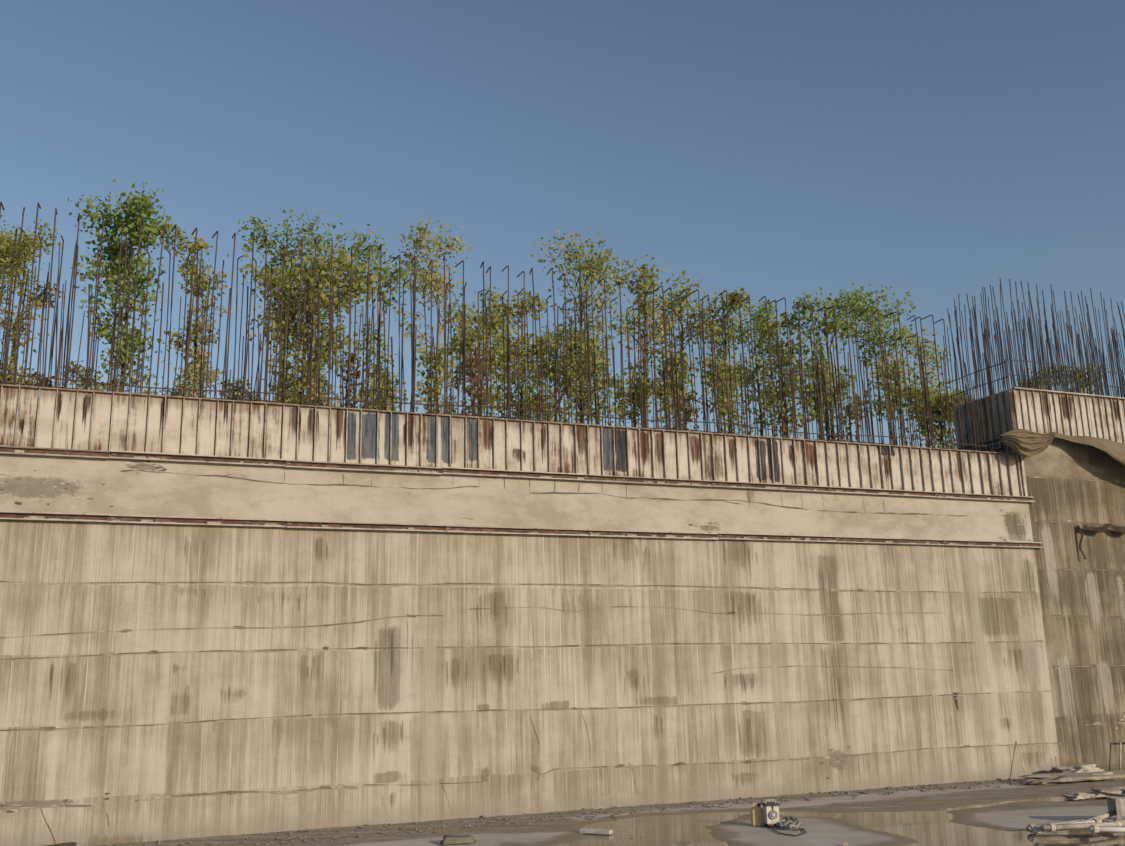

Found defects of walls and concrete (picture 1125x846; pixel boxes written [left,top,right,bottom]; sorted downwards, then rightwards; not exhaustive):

corrosion [82,395,91,424]
corrosion [159,397,168,433]
corrosion [289,407,319,440]
corrosion [335,409,345,448]
corrosion [404,414,414,451]
corrosion [640,431,666,464]
corrosion [690,436,700,463]
corrosion [788,443,816,471]
corrosion [1040,394,1073,418]
crack [0,581,1125,795]
crack [135,780,511,810]
crack [0,804,109,844]